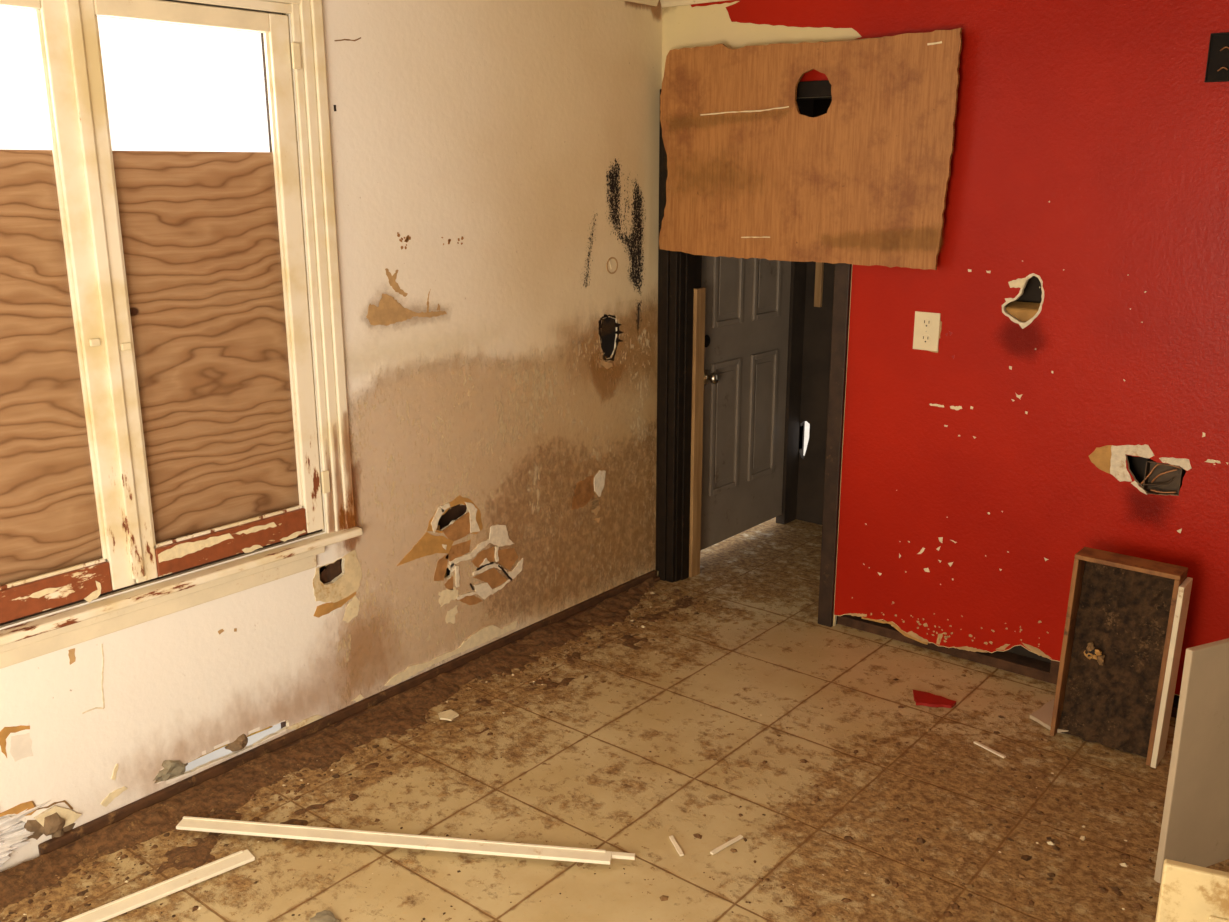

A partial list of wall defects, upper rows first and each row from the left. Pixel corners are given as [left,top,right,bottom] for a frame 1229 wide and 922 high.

peeling [366,268,447,326]
spalling [1002,273,1044,329]
spalling [598,314,624,369]
damp [354,328,657,659]
spalling [1089,444,1191,495]
peeling [158,522,306,563]
flaking render [397,495,523,624]
peeling [28,587,61,598]
peeling [84,581,101,603]
peeling [848,602,1052,659]
flaking render [0,800,82,867]